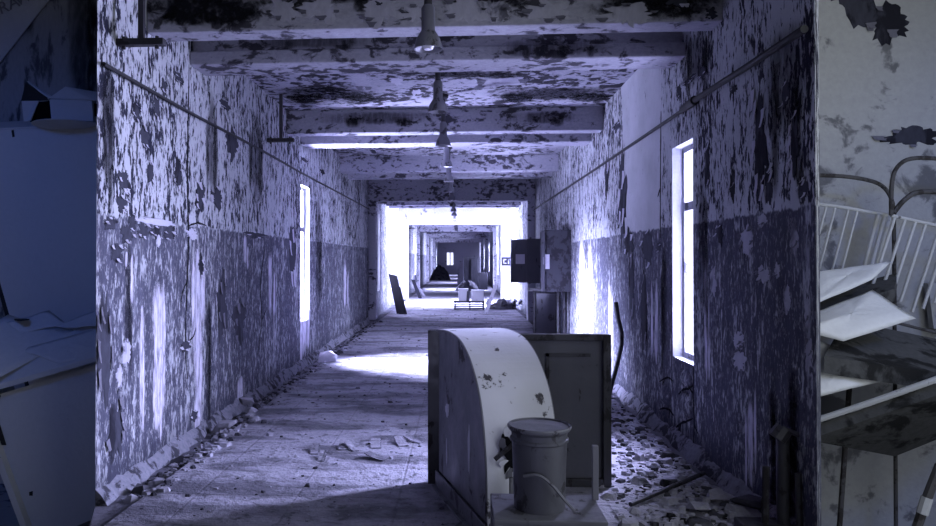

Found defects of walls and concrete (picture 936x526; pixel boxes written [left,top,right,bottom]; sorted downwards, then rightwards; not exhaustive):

peeling [270,0,342,25]
peeling [357,0,423,29]
peeling [595,0,689,28]
peeling [132,71,184,148]
peeling [476,77,529,89]
peeling [103,170,198,263]
peeling [147,160,155,188]
peeling [194,182,222,213]
peeling [738,88,773,255]
peeling [289,226,297,287]
peeling [602,144,661,355]
peeling [96,291,135,465]